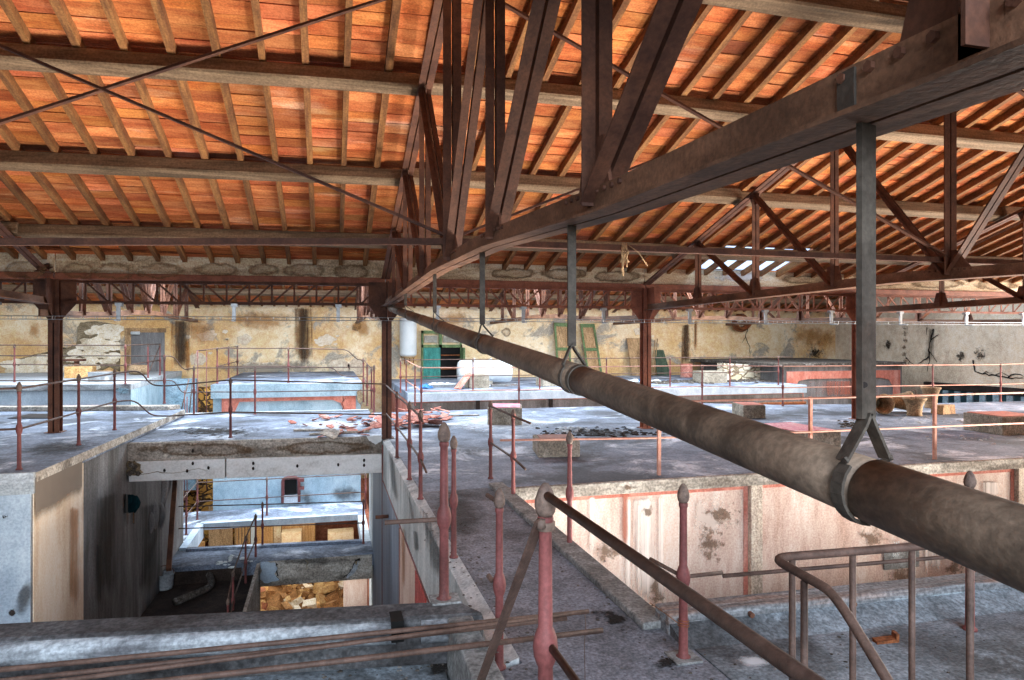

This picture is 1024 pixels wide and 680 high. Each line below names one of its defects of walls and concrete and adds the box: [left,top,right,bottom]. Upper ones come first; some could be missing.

spalling [0,352,48,373]
spalling [63,321,124,372]
water stain [172,321,189,369]
water stain [222,308,316,372]
crack [906,327,938,371]
crack [972,360,1023,379]
spalling [126,460,143,476]
water stain [701,508,740,561]